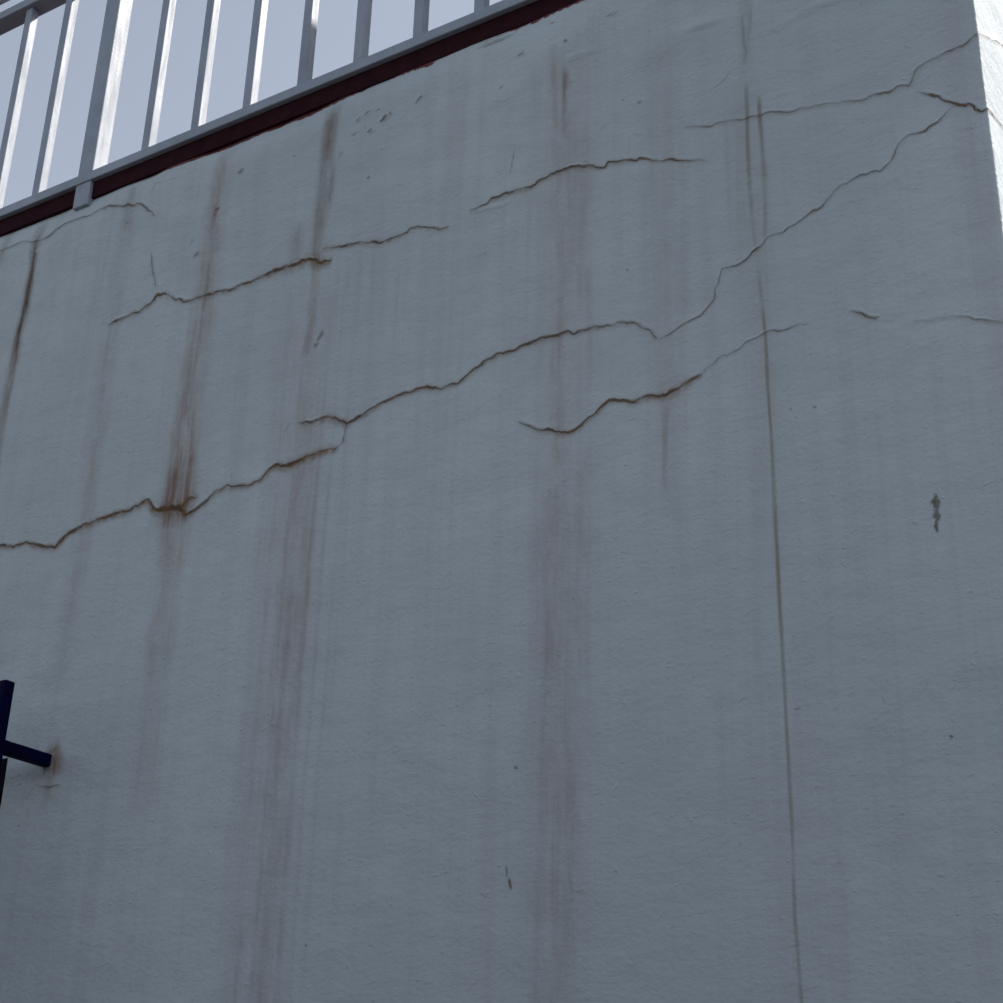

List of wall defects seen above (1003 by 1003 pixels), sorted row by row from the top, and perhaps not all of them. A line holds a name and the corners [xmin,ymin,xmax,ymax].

crack [0,89,1003,549]